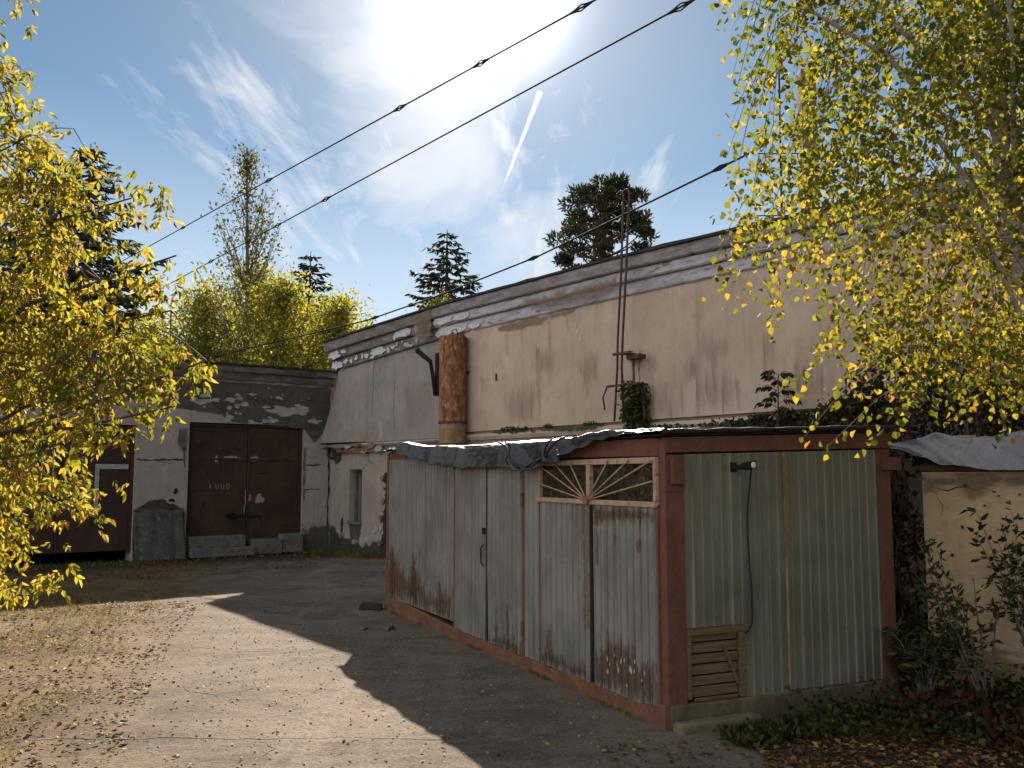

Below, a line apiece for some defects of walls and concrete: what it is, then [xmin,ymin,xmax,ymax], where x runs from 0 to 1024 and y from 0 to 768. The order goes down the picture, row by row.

peeling [327,312,480,370]
peeling [190,387,322,424]
spalling [377,472,387,558]
corrosion [388,550,452,618]
corrosion [544,639,657,707]